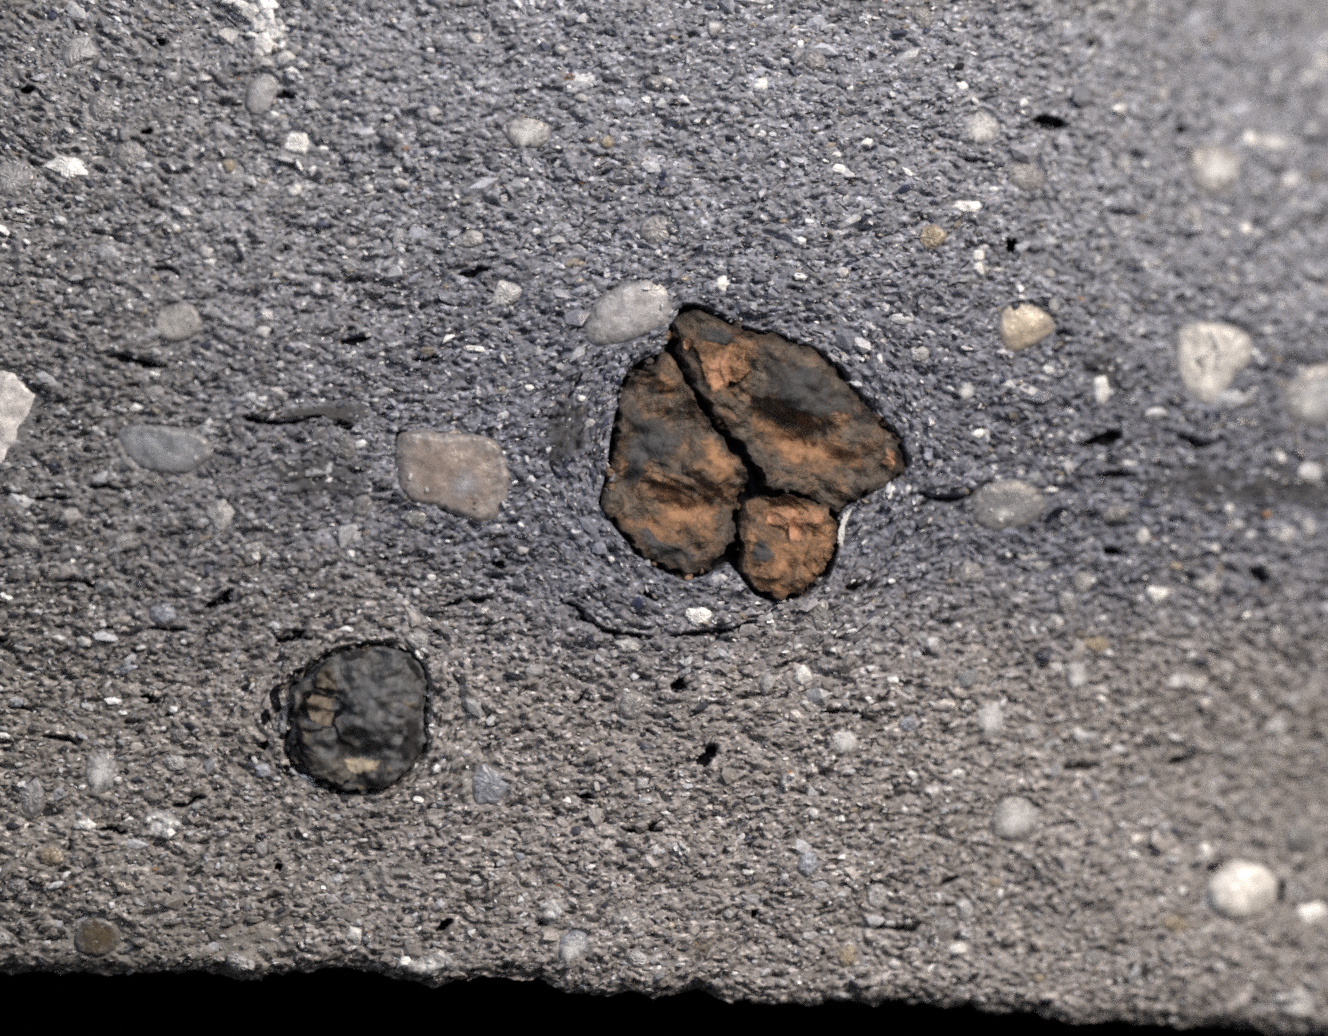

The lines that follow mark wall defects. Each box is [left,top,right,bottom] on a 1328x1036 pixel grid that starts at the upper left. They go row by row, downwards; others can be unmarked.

rust [707,353,736,392]
rust [702,438,734,476]
rust [754,411,861,473]
rust [882,449,895,470]
rust [658,488,718,533]
rust [764,505,824,573]